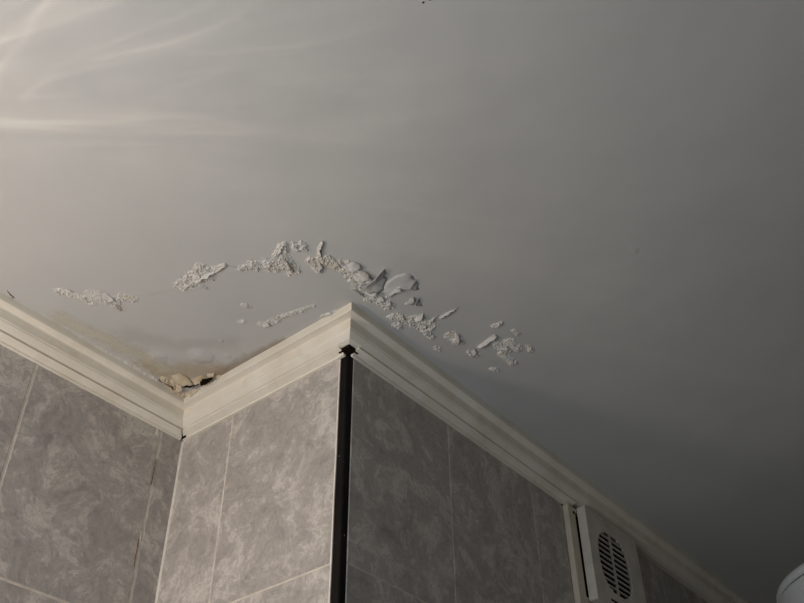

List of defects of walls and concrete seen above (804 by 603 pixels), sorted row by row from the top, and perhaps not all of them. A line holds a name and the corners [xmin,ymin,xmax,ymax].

peeling [53,287,140,312]
peeling [172,240,535,372]
spalling [159,372,221,398]